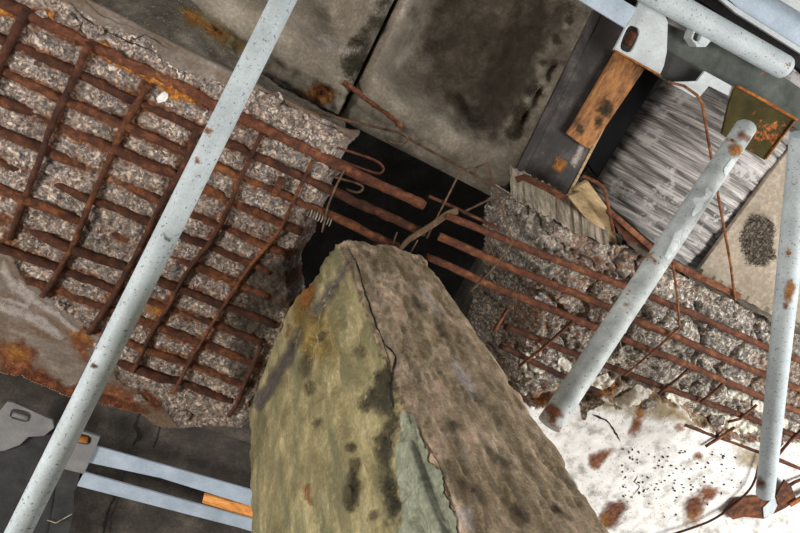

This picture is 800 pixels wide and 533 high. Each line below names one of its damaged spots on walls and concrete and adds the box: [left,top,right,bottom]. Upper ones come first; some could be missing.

leakage [344,0,392,81]
leakage [426,0,573,140]
spalling [0,0,226,350]
spalling [113,88,427,428]
crack [348,248,397,409]
spalling [424,184,645,410]
corrosion [589,449,611,469]
corrosion [598,500,626,528]
spalling [579,229,771,454]
corrosion [684,487,718,523]
corrosion [783,281,796,309]
spalling [779,333,800,470]